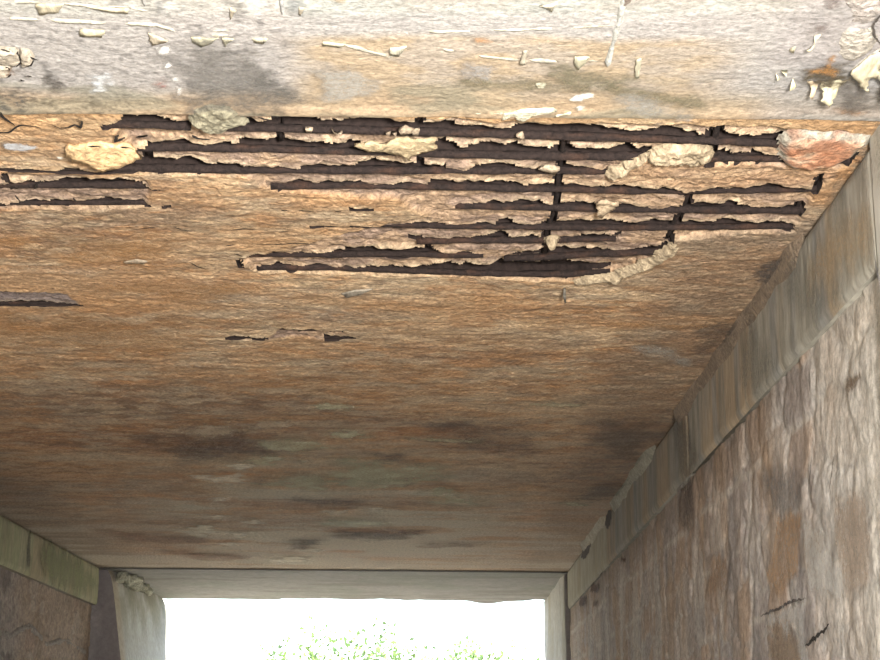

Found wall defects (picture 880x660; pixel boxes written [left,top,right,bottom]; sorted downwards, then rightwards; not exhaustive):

peeling [35,3,64,15]
peeling [87,6,129,14]
peeling [79,29,105,38]
peeling [191,36,234,47]
peeling [389,46,407,57]
spalling [0,46,35,78]
peeling [851,52,880,92]
peeling [807,80,842,107]
spalling [0,114,868,283]
spalling [0,291,83,307]
spalling [223,327,356,342]
leakage [184,425,292,485]